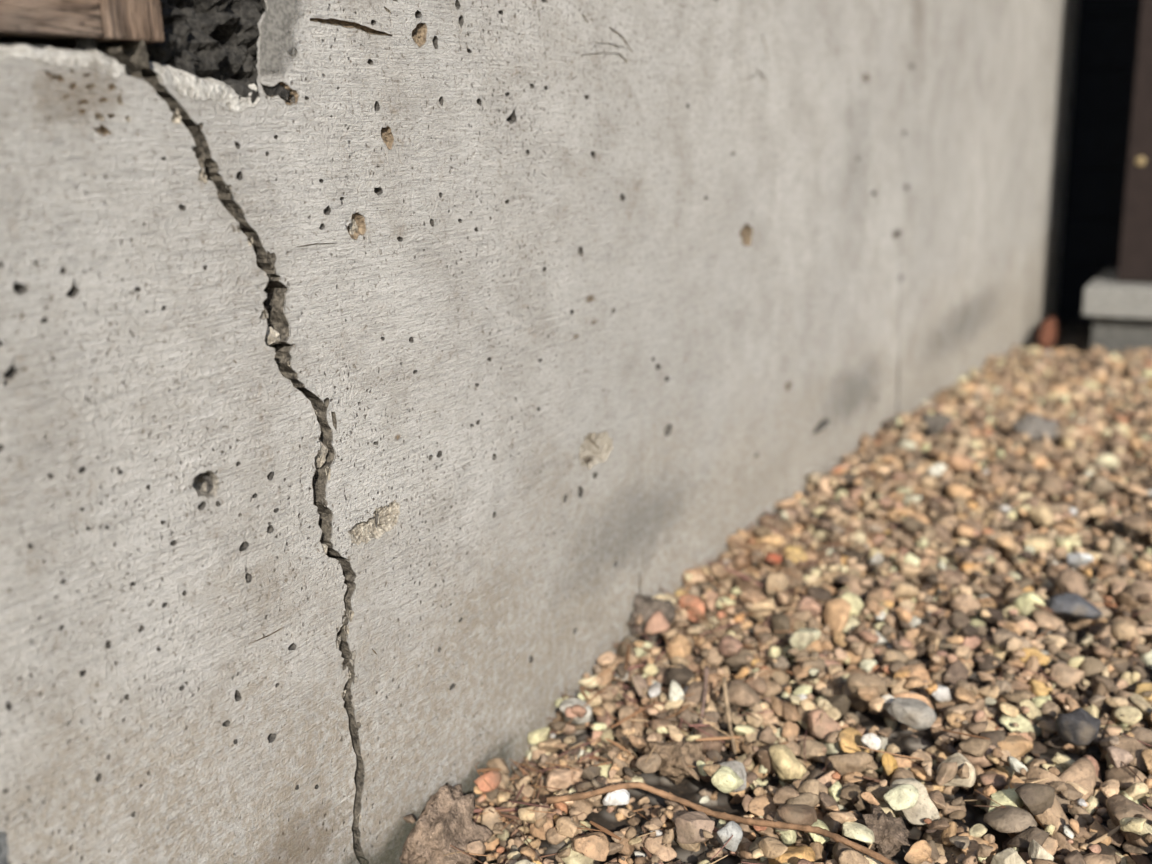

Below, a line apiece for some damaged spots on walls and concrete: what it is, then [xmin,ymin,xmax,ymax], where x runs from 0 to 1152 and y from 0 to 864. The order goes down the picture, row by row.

crack [102,40,369,864]